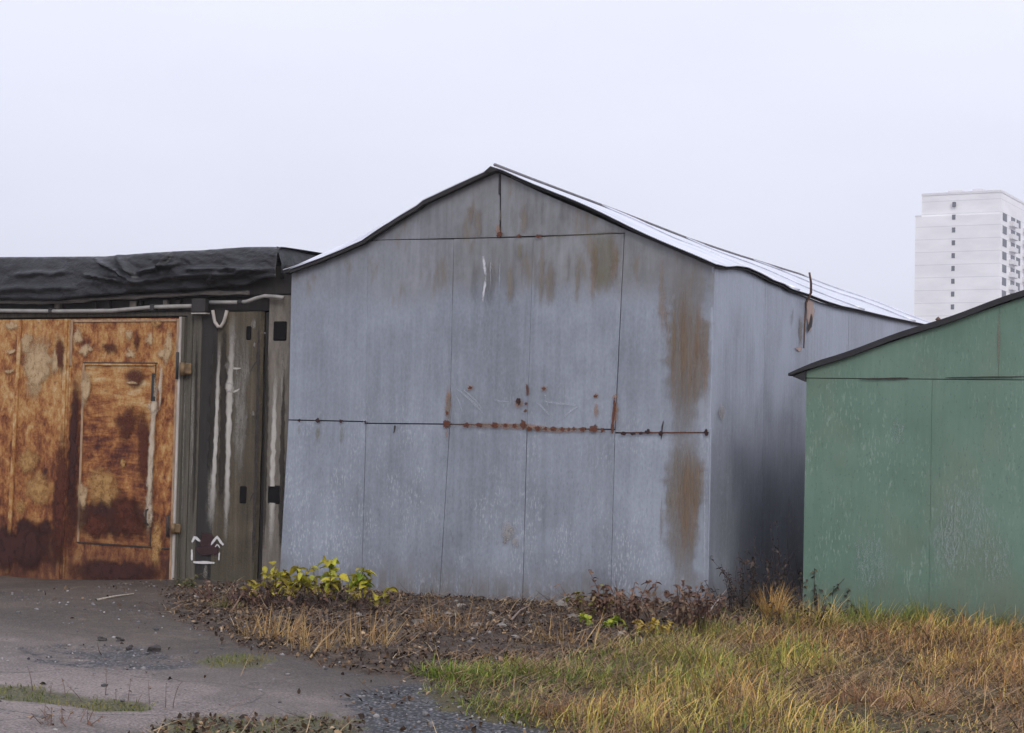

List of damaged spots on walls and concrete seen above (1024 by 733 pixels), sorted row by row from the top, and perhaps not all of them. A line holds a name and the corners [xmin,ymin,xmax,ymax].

rust [796,300,815,351]
rust [56,340,64,369]
water stain [181,331,249,520]
water stain [263,350,285,545]
rust [443,392,451,436]
rust [463,385,708,436]
rust [0,393,80,571]
rust [661,449,701,565]
rust [75,559,155,580]